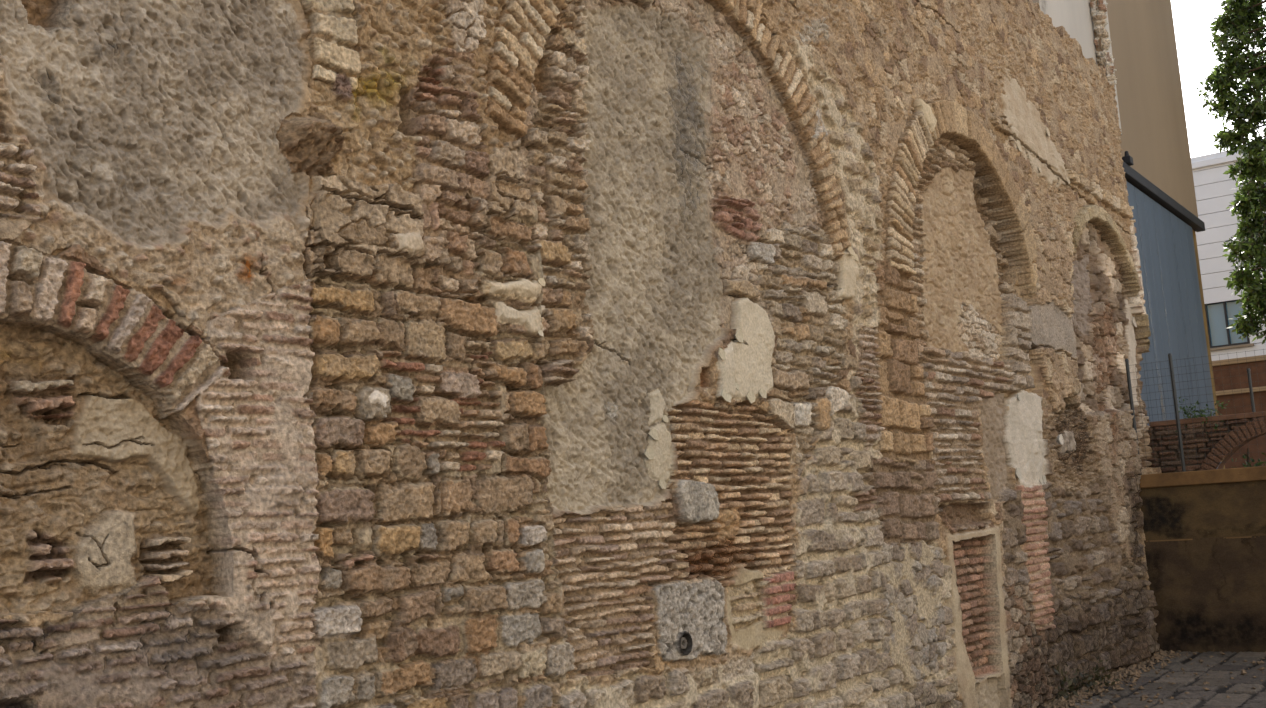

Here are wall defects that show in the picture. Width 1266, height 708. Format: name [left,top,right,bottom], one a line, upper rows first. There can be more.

flaking render [715,297,776,404]
crack [76,391,136,400]
crack [0,436,156,500]